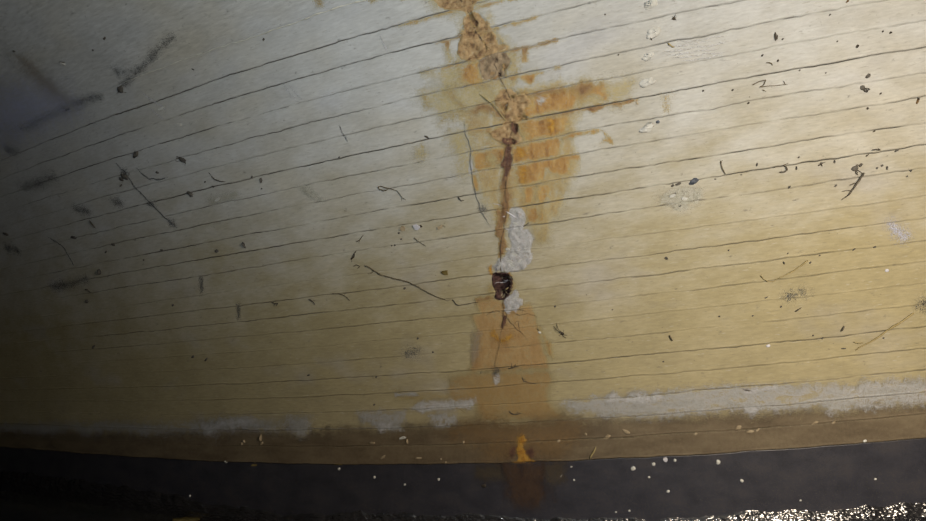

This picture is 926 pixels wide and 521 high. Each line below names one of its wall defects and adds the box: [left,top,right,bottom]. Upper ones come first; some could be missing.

corrosion [398,0,639,248]
crack [460,0,537,359]
damp [493,204,535,273]
spalling [486,265,517,301]
corrosion [468,294,556,376]
damp [504,290,523,314]
damp [0,374,926,480]